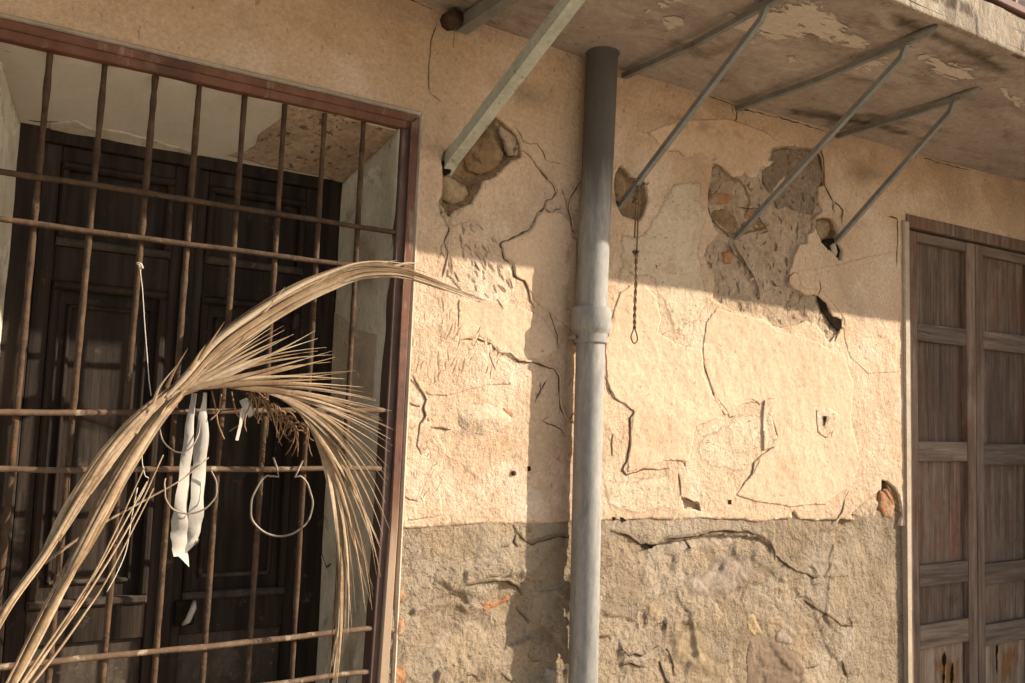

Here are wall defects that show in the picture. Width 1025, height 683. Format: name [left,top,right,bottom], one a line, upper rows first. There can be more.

crack [440,222,452,277]
flaking render [410,117,577,396]
crack [461,126,581,437]
flaking render [604,118,898,513]
crack [408,375,431,454]
crack [605,376,687,496]
crack [662,316,778,489]
flaking render [850,480,901,523]
flaking render [686,555,754,596]
crack [610,527,853,627]
flaking render [395,665,406,683]
flaking render [746,614,805,683]